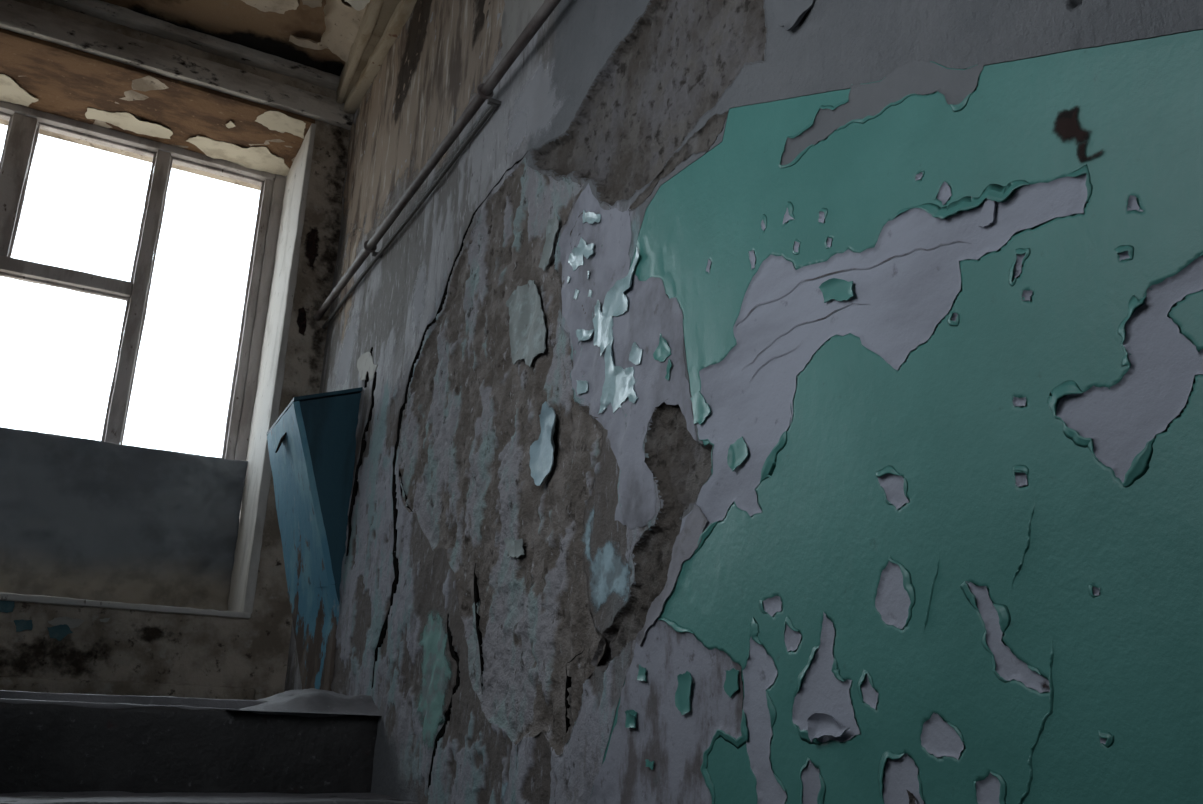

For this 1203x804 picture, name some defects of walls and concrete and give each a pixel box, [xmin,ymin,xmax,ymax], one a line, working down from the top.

peeling [242,0,370,63]
peeling [0,74,38,107]
peeling [85,108,290,177]
peeling [255,111,306,139]
peeling [1114,245,1134,261]
crack [345,151,528,688]
spalling [398,0,1093,804]
peeling [1047,253,1203,488]
leakage [0,639,108,676]
leakage [141,626,164,642]
crack [428,563,484,789]